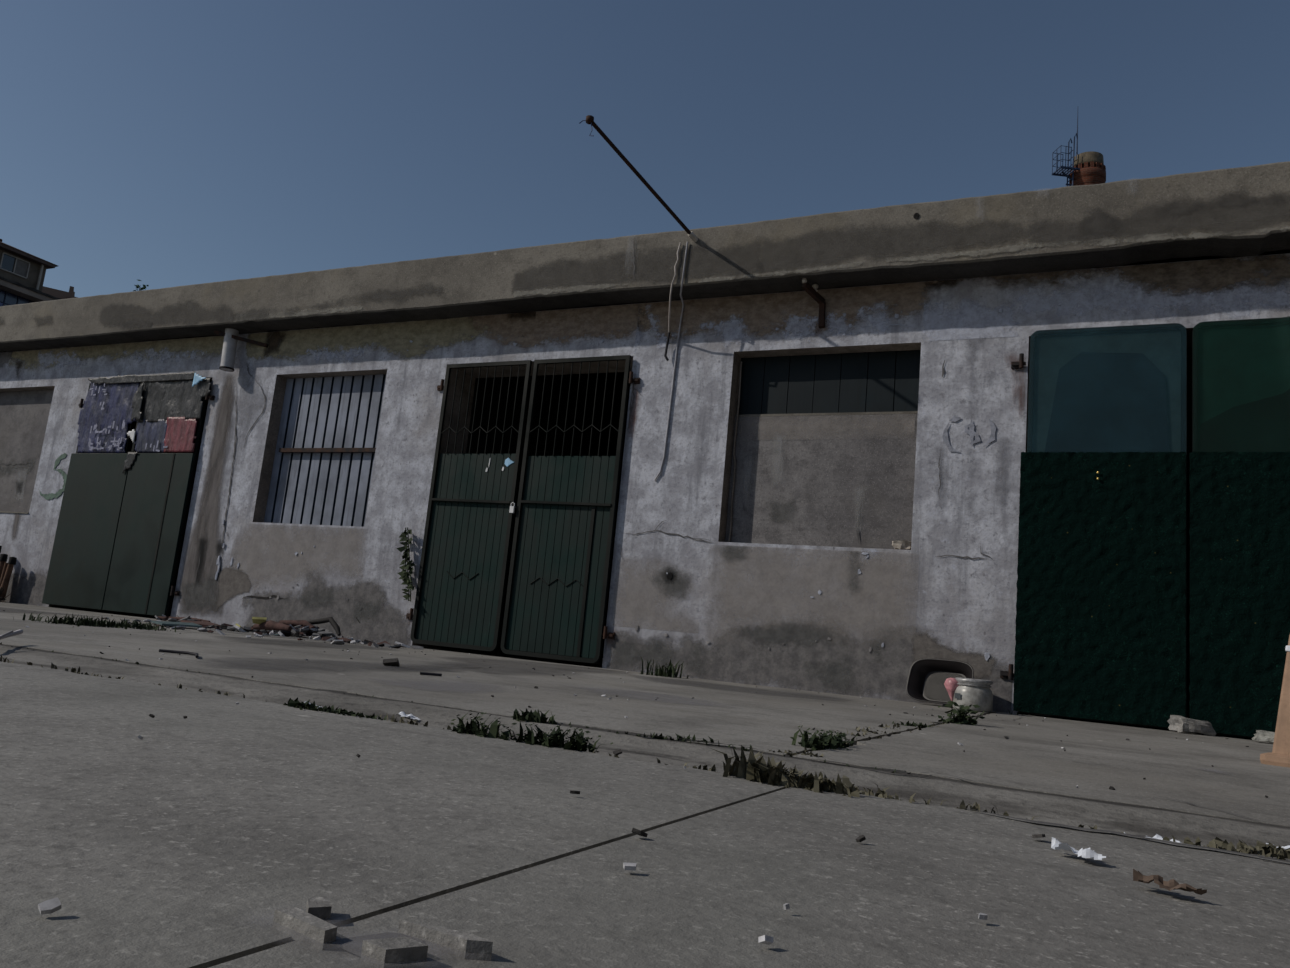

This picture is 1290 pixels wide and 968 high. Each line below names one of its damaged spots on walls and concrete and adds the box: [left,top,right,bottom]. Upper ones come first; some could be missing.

water stain [512,193,1290,297]
water stain [923,279,1290,341]
crack [619,520,714,560]
peeling [608,622,1012,713]